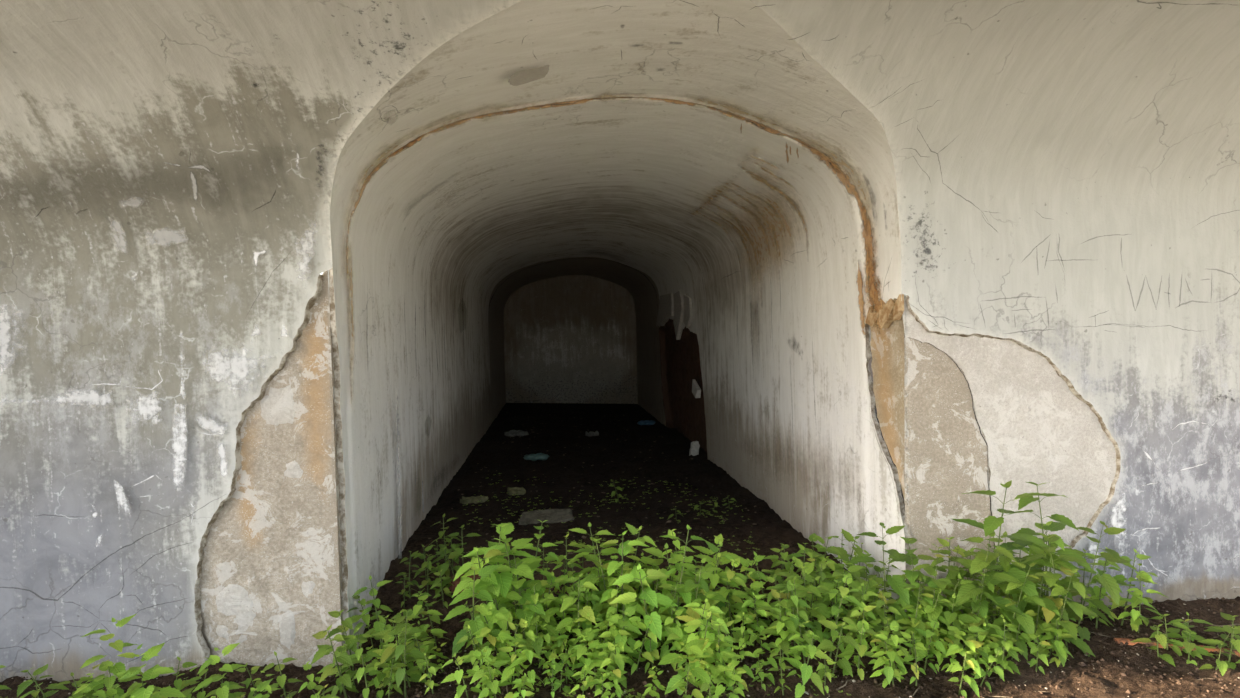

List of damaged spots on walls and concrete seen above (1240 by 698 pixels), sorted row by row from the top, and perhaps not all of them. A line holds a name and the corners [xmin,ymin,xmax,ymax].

leakage [297,232,313,278]
rust [346,96,883,339]
leakage [0,305,16,371]
crack [0,505,206,662]
leakage [33,356,227,511]
leakage [204,349,265,395]
flaking render [194,264,350,667]
flaking render [865,293,1121,600]
leakage [1111,493,1126,553]